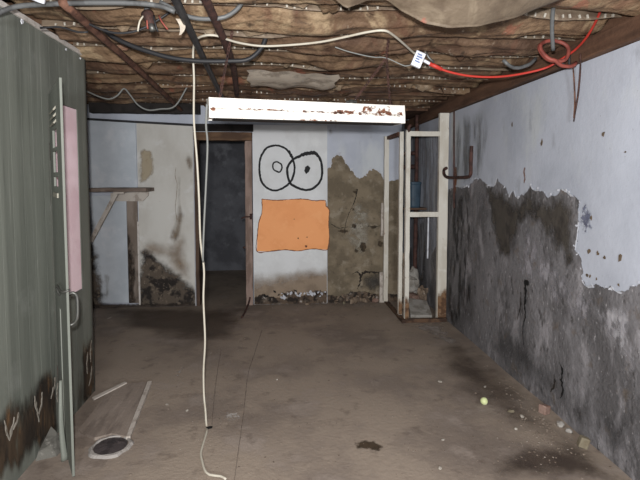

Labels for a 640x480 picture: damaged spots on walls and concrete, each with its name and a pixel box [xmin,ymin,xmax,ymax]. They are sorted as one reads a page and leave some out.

rust [325,106,402,121]
damp [121,235,233,337]
peeling [254,152,399,305]
crack [331,189,381,234]
peeling [409,223,437,311]
peeling [446,177,640,480]